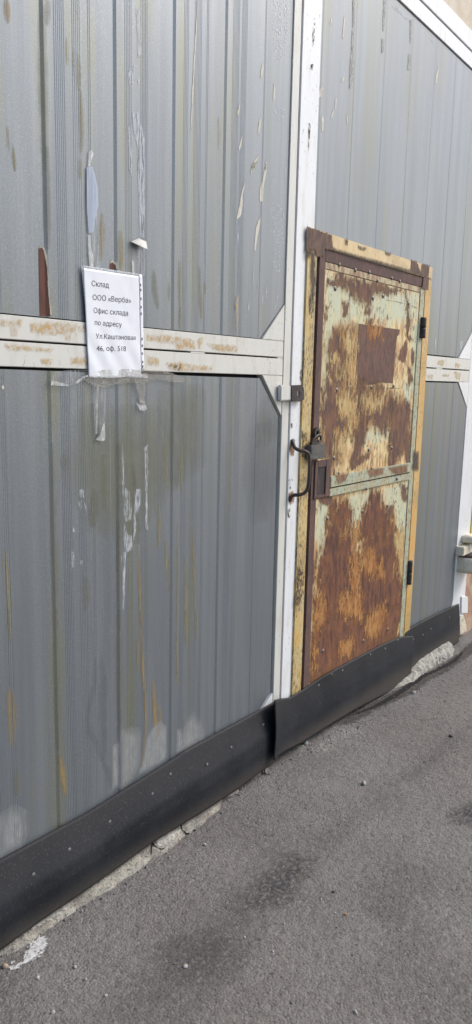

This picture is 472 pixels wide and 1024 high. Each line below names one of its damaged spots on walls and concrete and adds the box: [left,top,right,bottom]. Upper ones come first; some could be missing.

peeling [237,156,267,220]
rust [3,247,86,338]
rust [148,358,211,370]
rust [148,336,237,351]
peeling [330,319,389,460]
rust [295,226,430,684]
water stain [121,447,148,607]
peeling [311,520,400,676]
peeling [393,528,405,581]